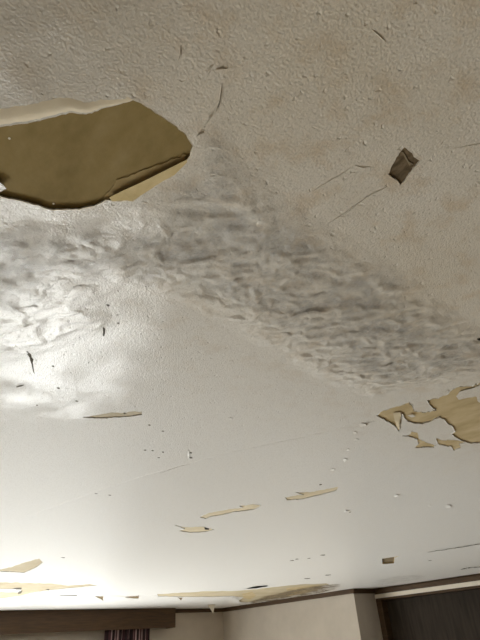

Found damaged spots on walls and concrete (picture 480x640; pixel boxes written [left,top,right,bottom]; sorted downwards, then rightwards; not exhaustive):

crack [197,65,227,136]
peeling [0,97,194,211]
crack [312,165,371,192]
spalling [389,147,419,184]
crack [328,187,386,224]
peeling [82,411,142,419]
peeling [375,382,480,451]
peeling [284,484,339,500]
peeling [175,504,263,533]
peeling [0,558,44,573]
peeling [0,582,97,598]
peeling [156,575,331,604]